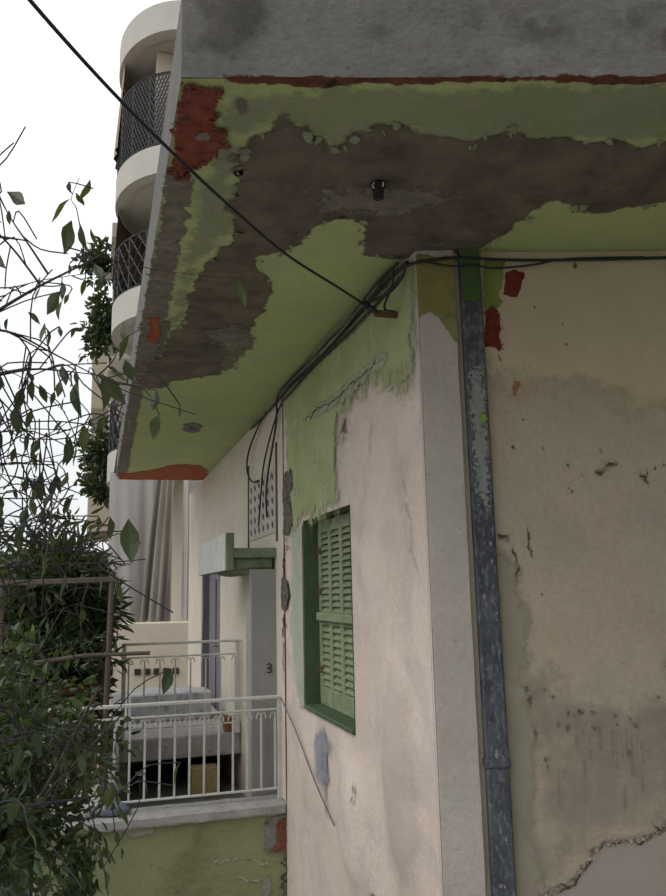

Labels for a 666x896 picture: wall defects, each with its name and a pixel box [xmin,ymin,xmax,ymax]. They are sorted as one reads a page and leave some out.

corrosion [116,464,208,480]
spalling [115,82,253,475]
peeling [281,248,525,707]
spalling [264,814,287,855]